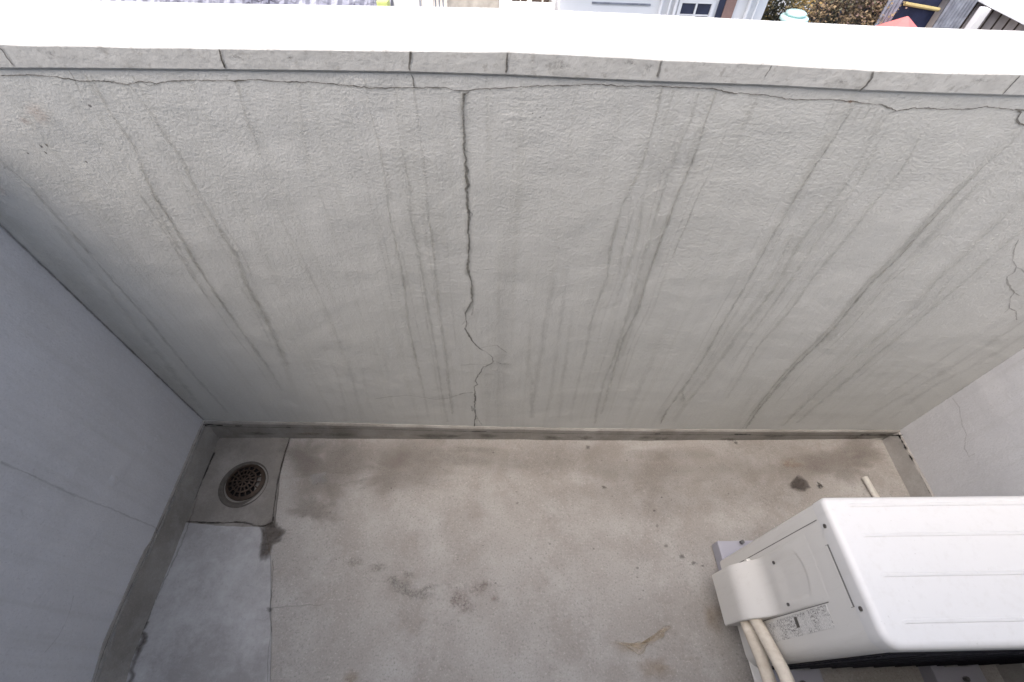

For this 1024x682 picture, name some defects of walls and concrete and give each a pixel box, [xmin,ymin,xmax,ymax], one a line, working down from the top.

crack [0,13,1024,426]
damp [261,522,283,557]